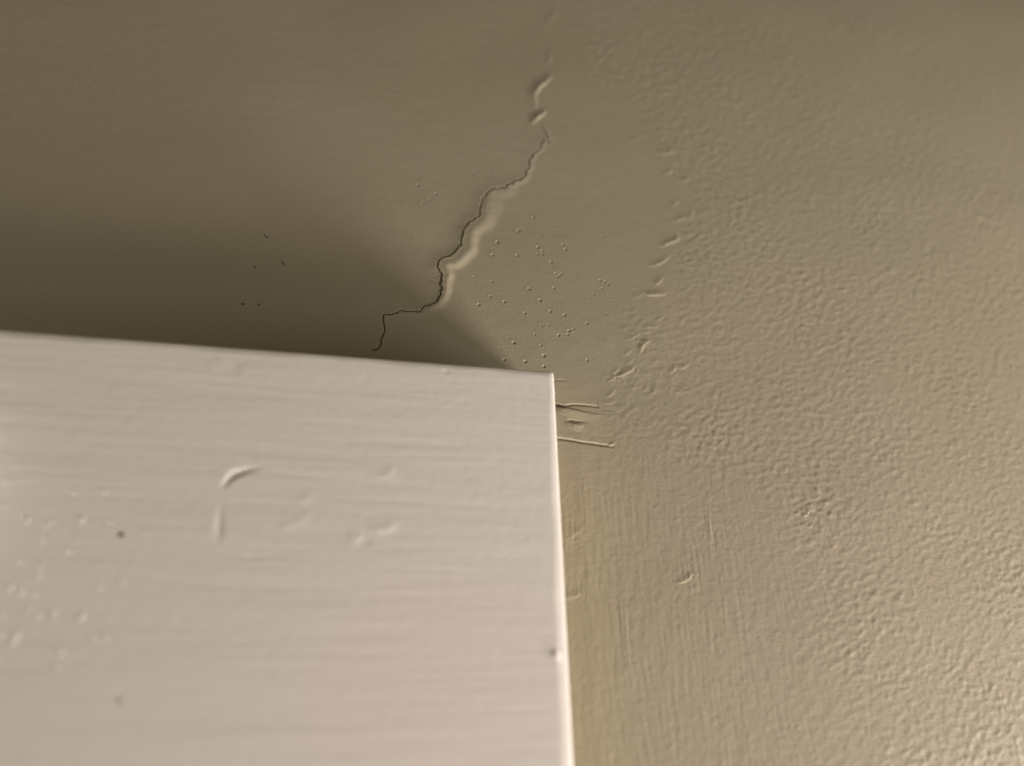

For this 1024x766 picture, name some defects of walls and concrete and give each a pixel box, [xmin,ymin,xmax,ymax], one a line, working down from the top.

crack [356,0,566,360]
crack [553,375,626,453]